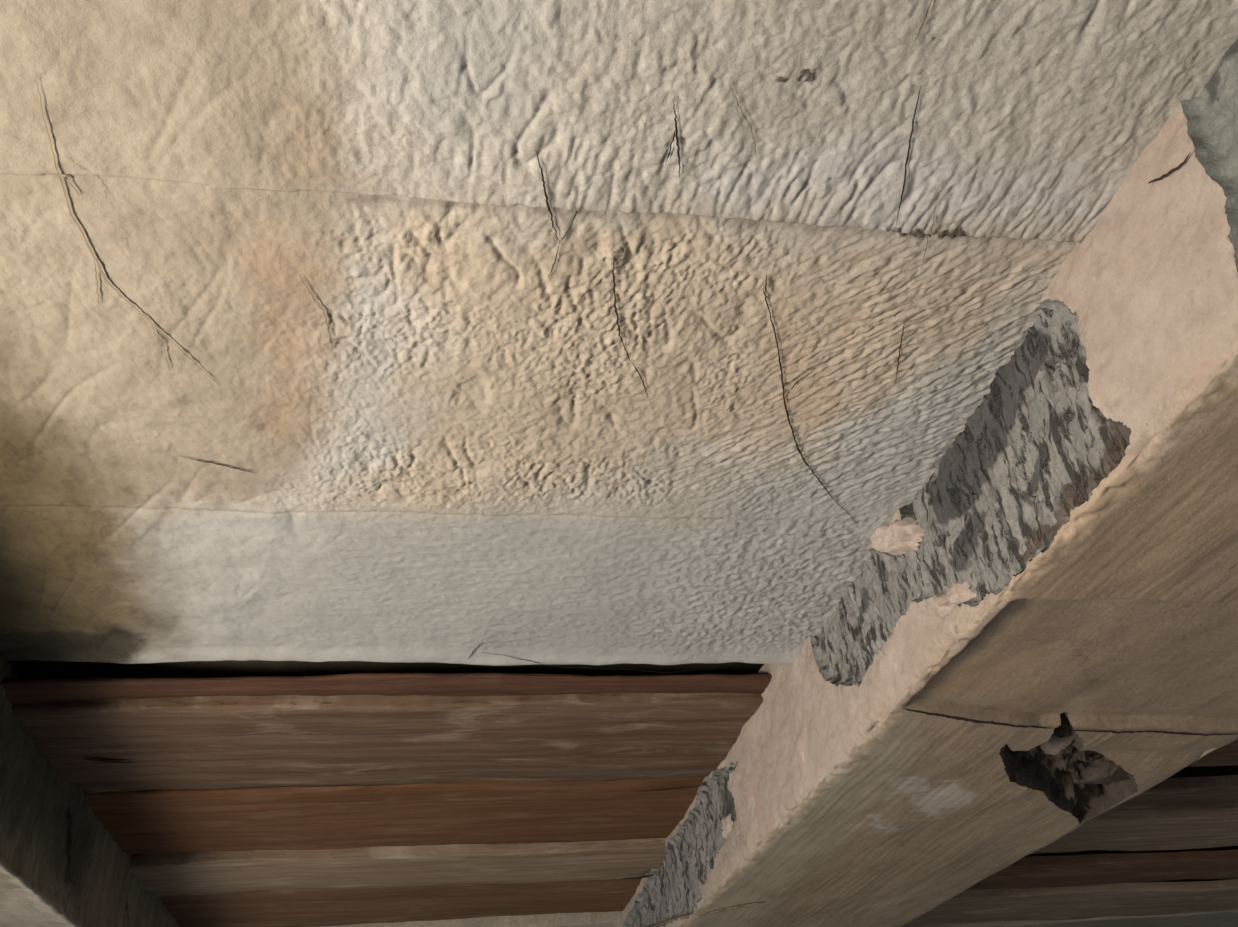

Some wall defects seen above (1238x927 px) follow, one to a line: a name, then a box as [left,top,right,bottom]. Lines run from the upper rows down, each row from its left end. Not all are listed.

crack [536,151,580,277]
flaking render [1180,39,1238,277]
crack [612,259,648,396]
crack [763,274,857,523]
flaking render [810,299,1131,687]
flaking render [623,761,738,927]
spalling [998,712,1138,825]
crack [905,708,1235,736]